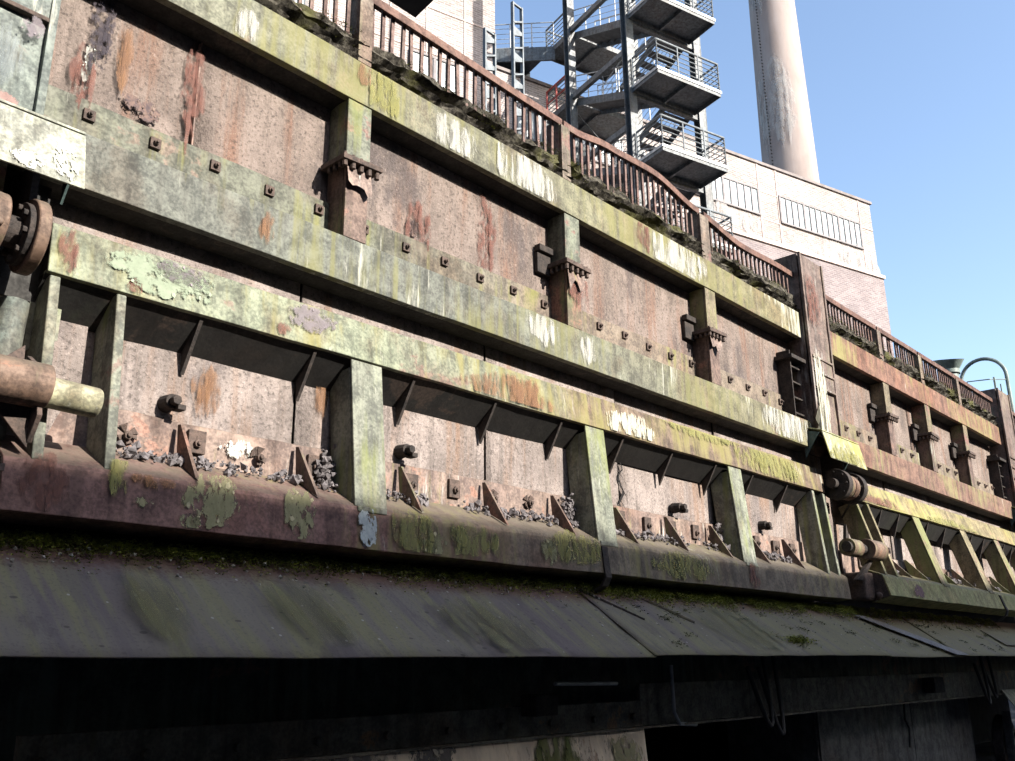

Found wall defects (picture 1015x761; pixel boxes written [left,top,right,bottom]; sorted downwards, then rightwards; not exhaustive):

peeling [10,145,80,181]
peeling [106,249,215,304]
peeling [290,304,337,334]
peeling [606,410,655,441]
peeling [219,439,254,459]
peeling [358,509,377,547]